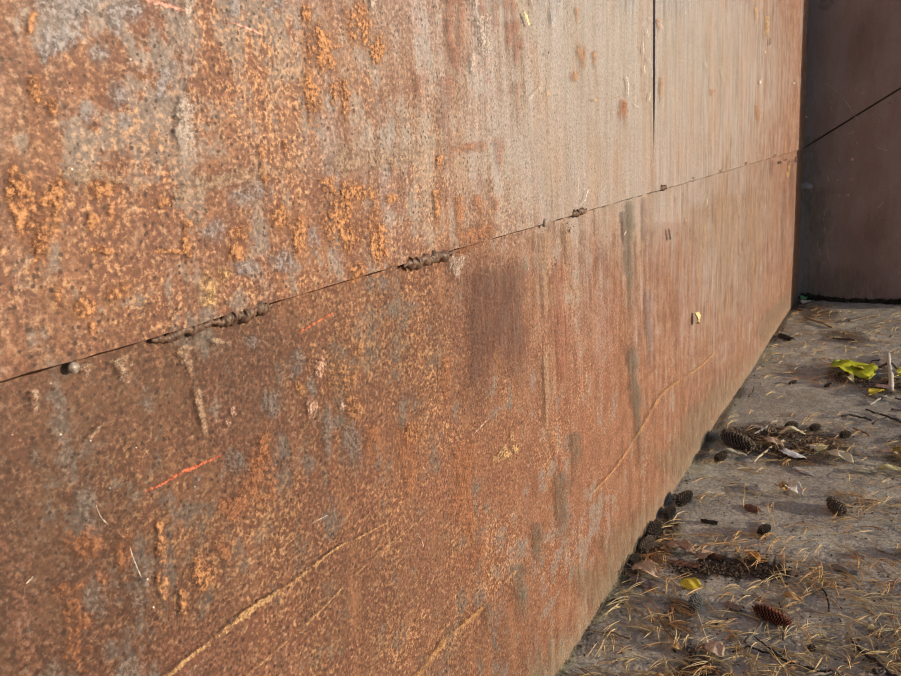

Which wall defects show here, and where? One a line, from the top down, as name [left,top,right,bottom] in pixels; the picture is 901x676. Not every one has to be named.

rust [346,1,386,64]
rust [302,5,351,126]
rust [6,166,69,262]
rust [88,175,116,231]
rust [229,224,247,261]
rust [273,205,306,257]
rust [320,176,397,282]
rust [75,296,97,334]
rust [196,389,207,432]
damp [543,353,555,422]
rust [157,520,169,600]
rust [194,556,214,590]